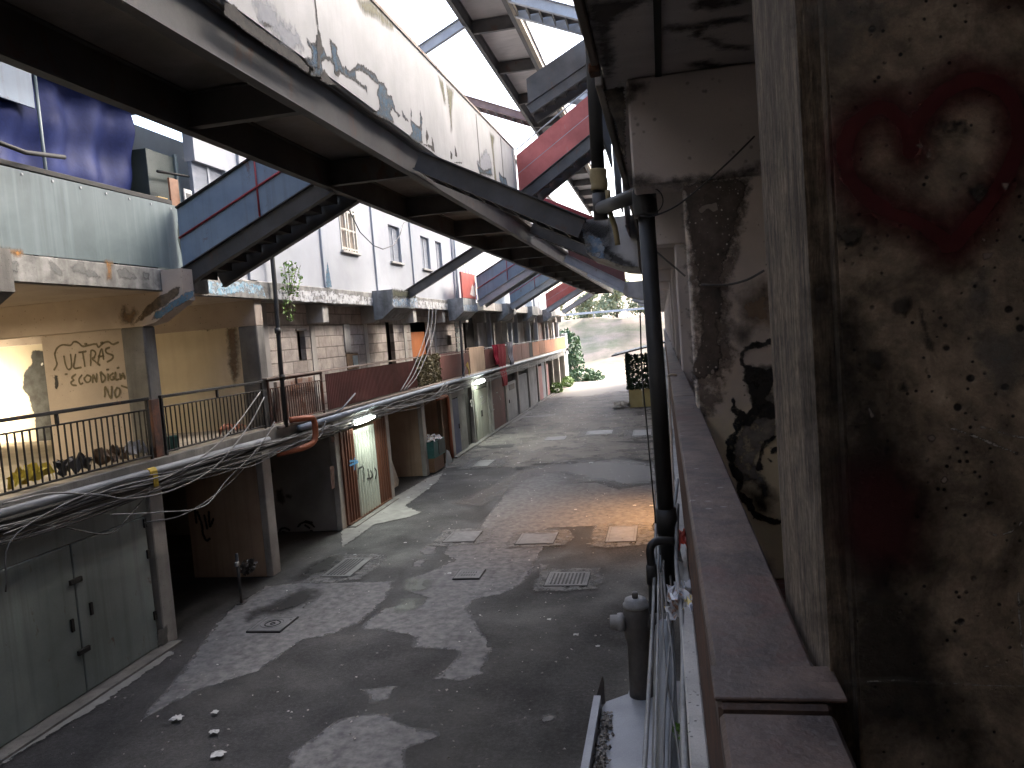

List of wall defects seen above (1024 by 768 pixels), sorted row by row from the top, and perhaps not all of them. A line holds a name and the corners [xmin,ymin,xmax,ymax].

spalling [135,287,195,323]
water stain [227,327,239,382]